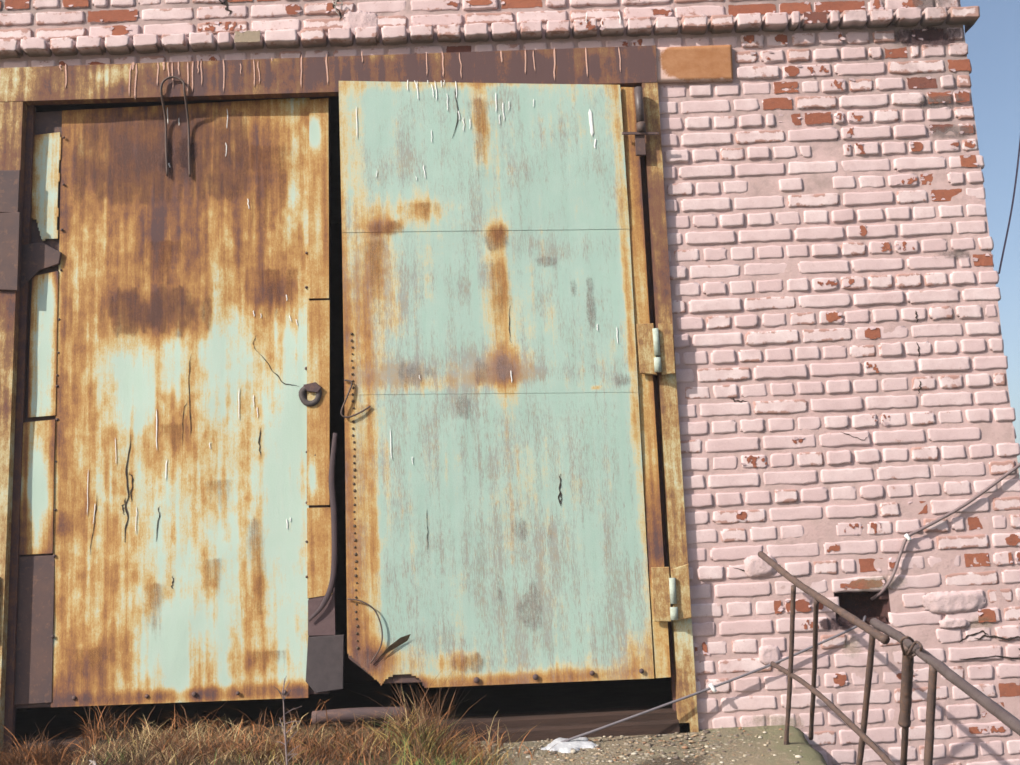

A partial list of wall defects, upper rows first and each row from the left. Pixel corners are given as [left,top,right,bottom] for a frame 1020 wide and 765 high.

spalling [906,76,970,104]
spalling [763,64,866,154]
spalling [929,124,978,167]
spalling [895,173,962,201]
spalling [972,253,993,266]
peeling [865,326,881,339]
spalling [964,553,990,567]
peeling [1005,534,1020,564]
spalling [834,558,896,626]
spalling [774,598,824,629]
crack [959,630,1020,660]
spalling [998,683,1020,707]